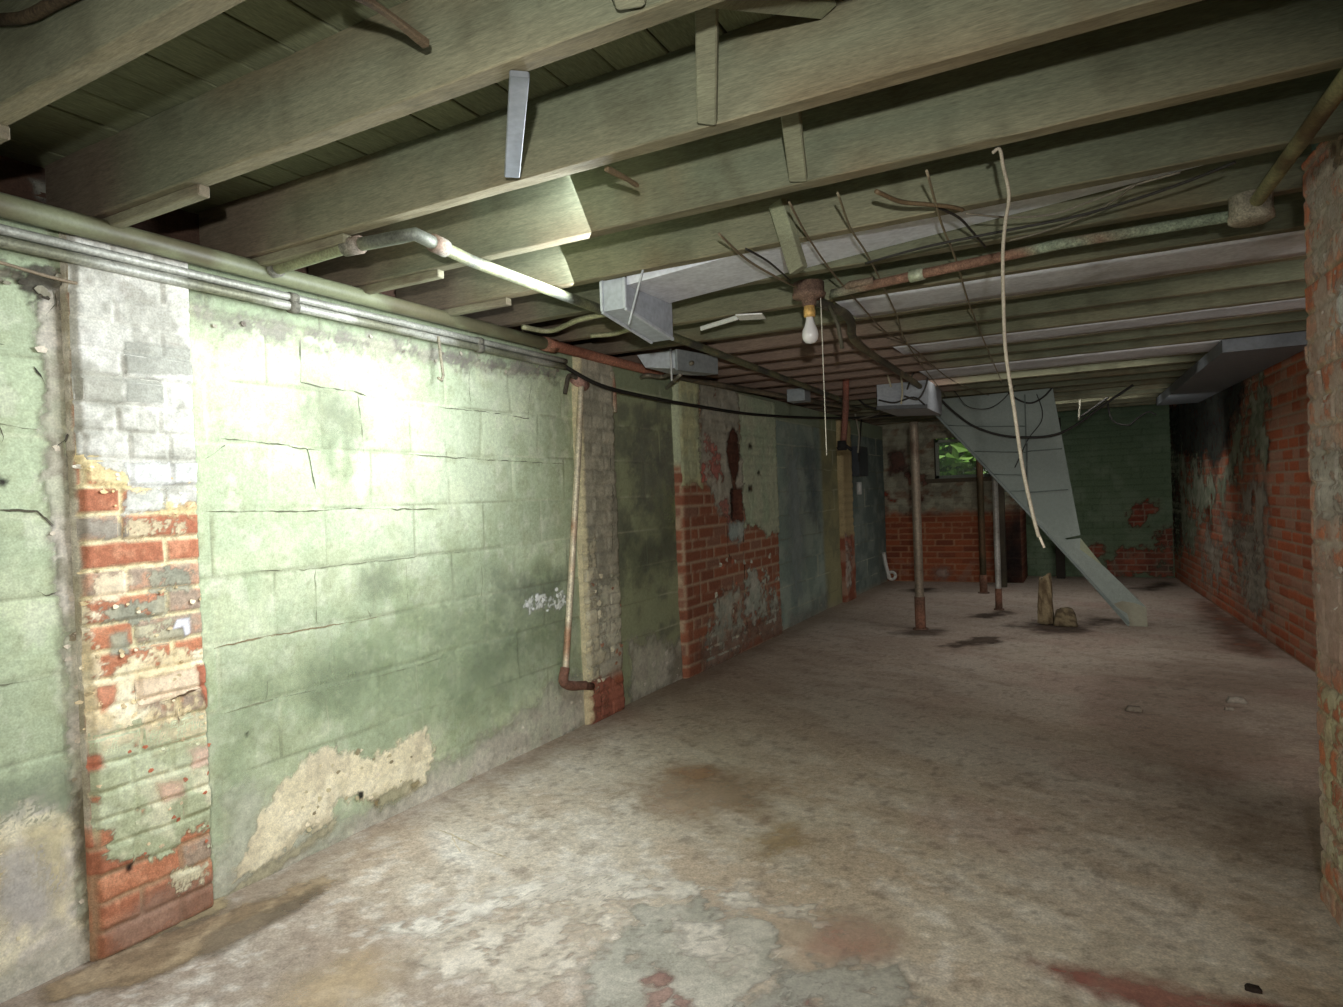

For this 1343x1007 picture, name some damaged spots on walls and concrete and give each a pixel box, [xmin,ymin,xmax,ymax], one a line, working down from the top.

crack [1,509,53,529]
crack [0,424,69,446]
peeling [678,380,780,542]
peeling [1088,371,1272,632]
peeling [0,233,683,1004]
peeling [700,553,783,670]
peeling [1317,654,1343,885]
leakage [42,875,338,1002]
peeling [380,872,845,995]
peeling [640,972,691,1007]